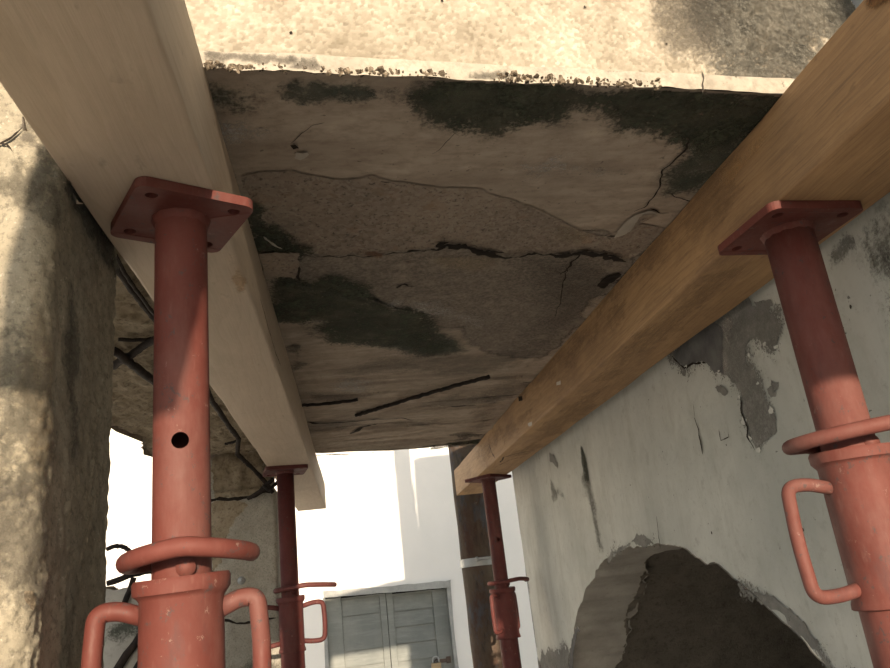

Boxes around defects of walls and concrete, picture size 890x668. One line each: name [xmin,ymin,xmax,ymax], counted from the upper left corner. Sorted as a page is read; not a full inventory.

leakage [654,0,723,58]
crack [0,127,23,150]
crack [634,139,690,213]
leakage [662,112,760,196]
crack [296,242,626,318]
spalling [111,249,154,452]
peeling [667,297,786,453]
spalling [209,384,277,538]
peeling [606,533,656,564]
peeling [537,626,580,668]
peeling [737,576,835,668]